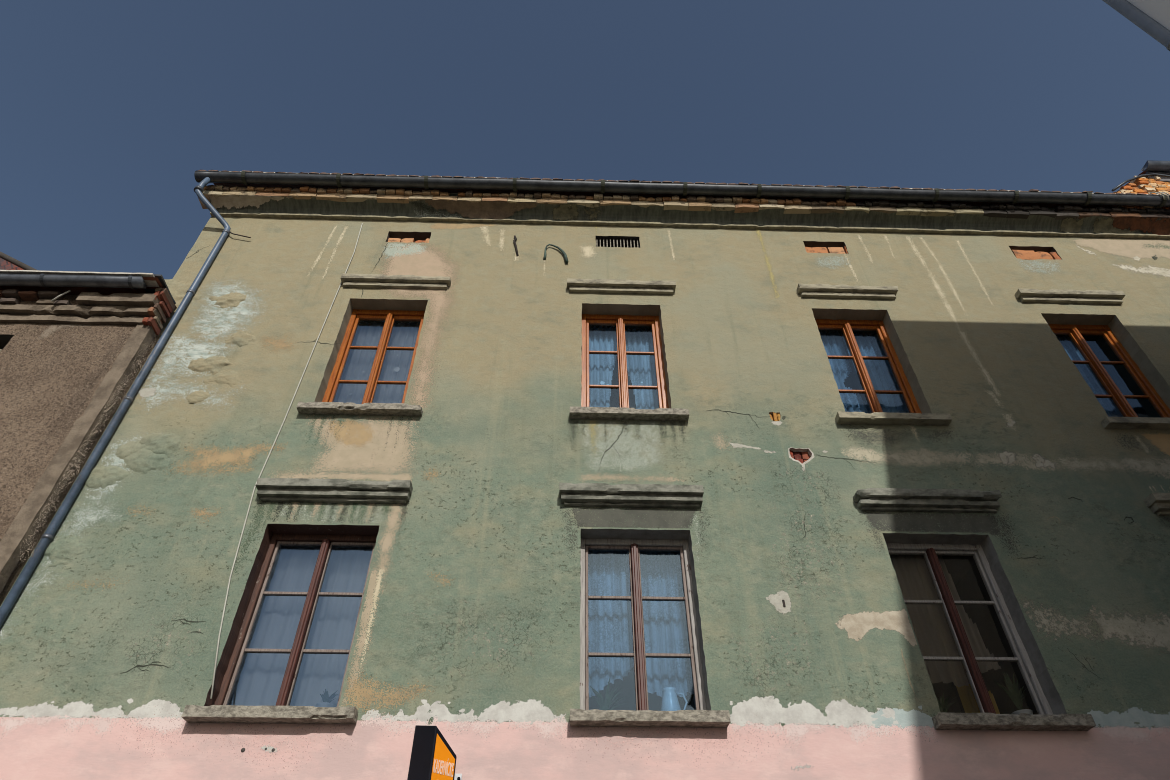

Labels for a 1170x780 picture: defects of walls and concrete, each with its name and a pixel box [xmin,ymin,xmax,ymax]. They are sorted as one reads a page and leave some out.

water stain [906,236,1016,431]
crack [599,421,626,470]
flaking render [788,447,814,471]
peeling [766,590,791,614]
peeling [835,609,917,646]
peeling [1021,599,1170,656]
peeling [360,699,567,725]
peeling [730,696,934,729]
peeling [1087,707,1170,730]